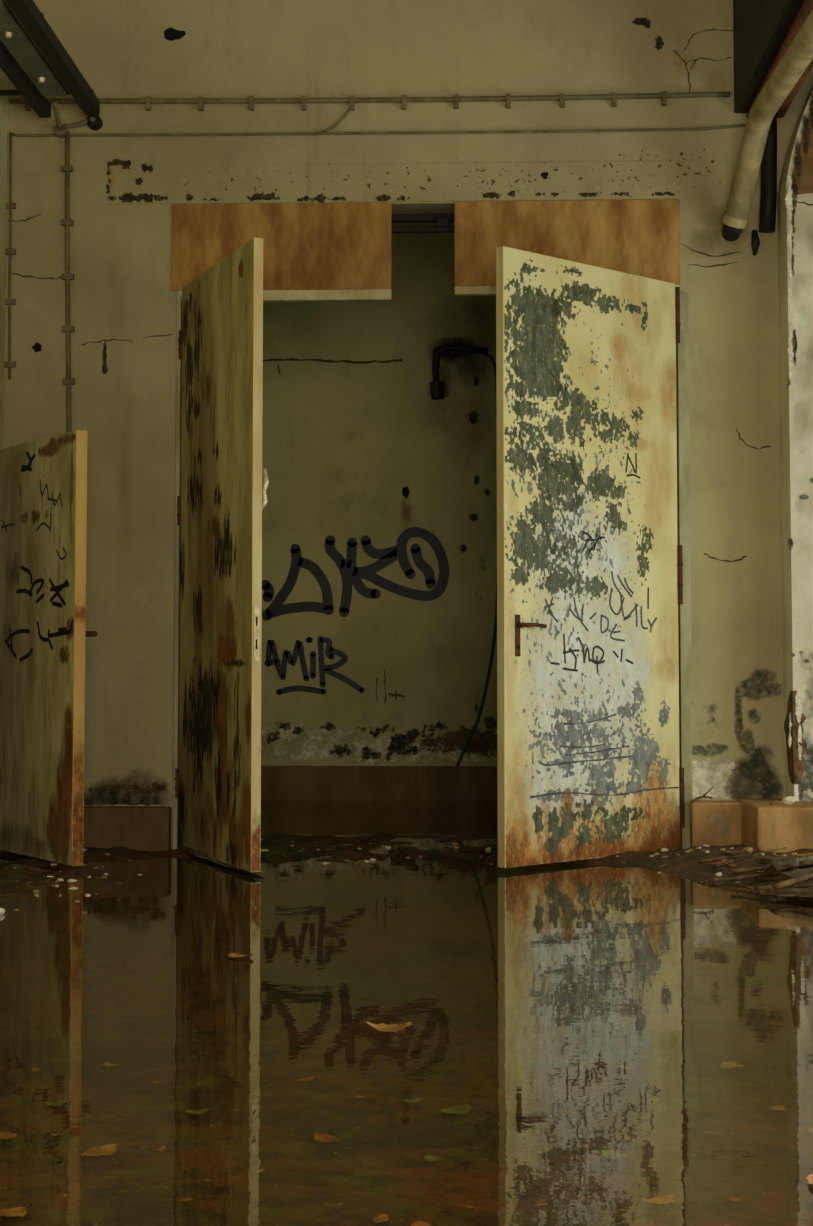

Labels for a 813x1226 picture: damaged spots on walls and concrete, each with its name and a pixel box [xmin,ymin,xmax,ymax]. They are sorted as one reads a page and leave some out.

peeling [106,159,168,203]
peeling [246,192,280,202]
peeling [297,193,346,203]
peeling [483,191,515,199]
rust [38,434,76,457]
peeling [504,257,671,858]
rust [60,608,86,662]
rust [201,601,261,872]
damp [692,670,781,799]
rust [46,708,84,866]
damp [798,740,813,801]
rust [506,773,681,868]